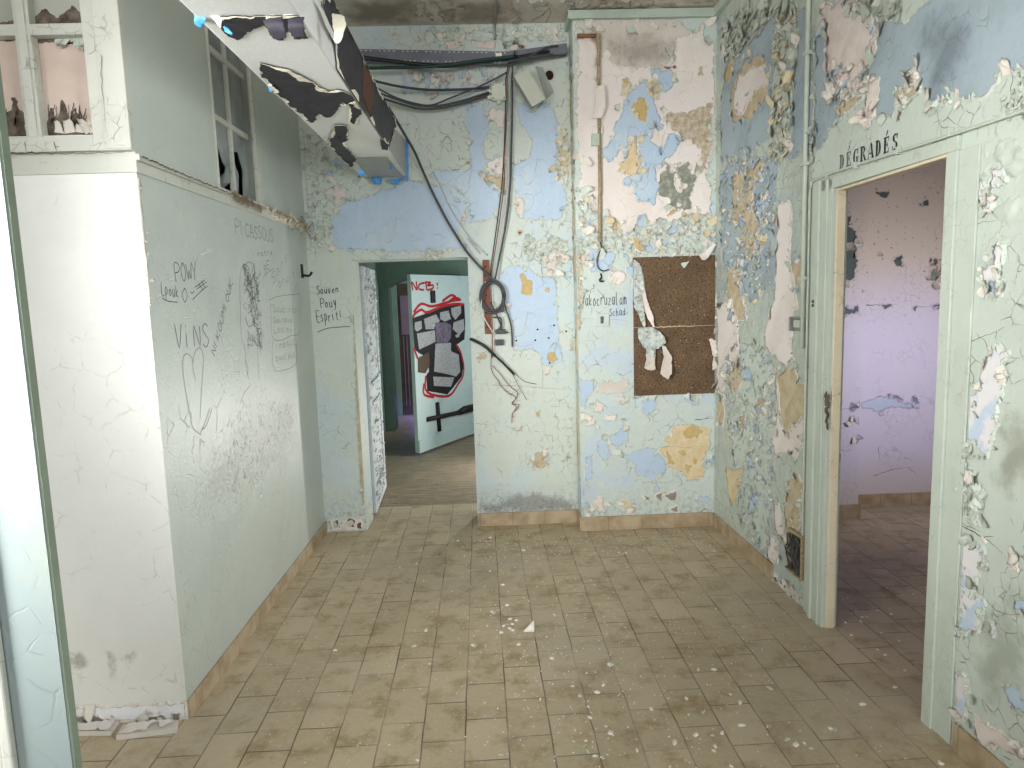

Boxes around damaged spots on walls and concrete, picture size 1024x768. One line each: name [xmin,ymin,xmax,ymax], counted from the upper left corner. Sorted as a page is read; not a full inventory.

crack [11,56,294,220]
peeling [265,0,1024,642]
spalling [75,700,188,723]
peeling [948,670,1024,761]